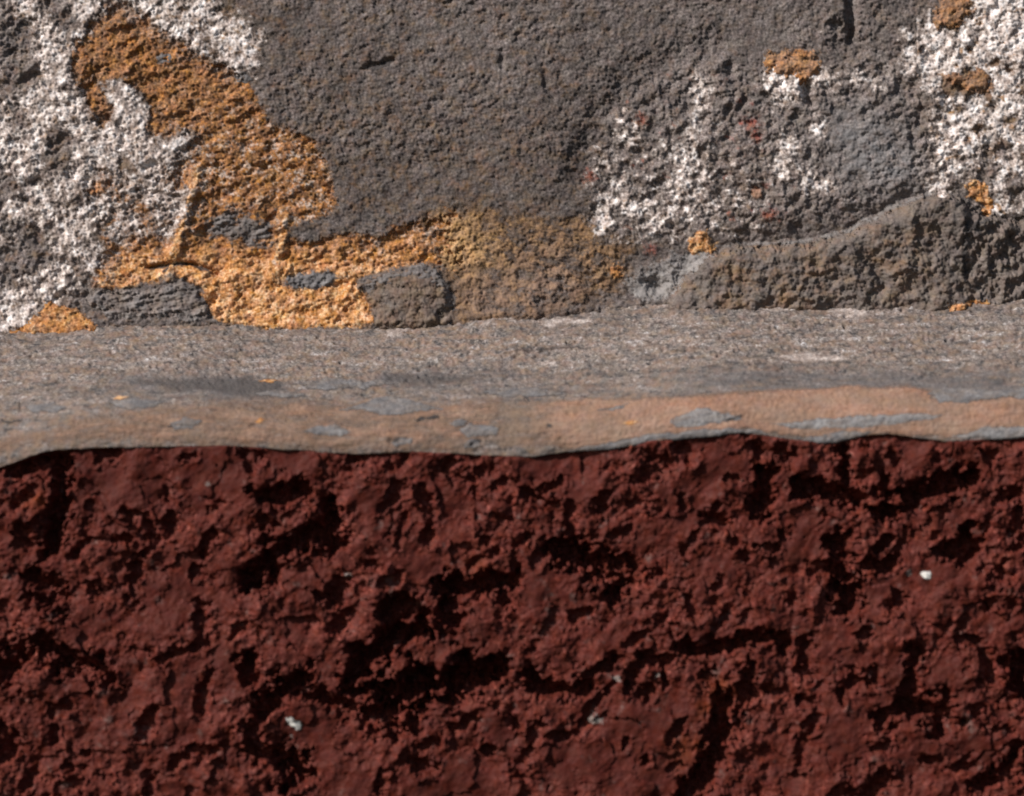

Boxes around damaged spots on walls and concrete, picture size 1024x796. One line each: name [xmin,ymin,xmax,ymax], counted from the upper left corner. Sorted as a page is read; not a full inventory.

water stain [0,0,267,334]
peeling [9,0,465,334]
water stain [439,71,840,321]
peeling [763,49,822,87]
water stain [763,58,887,140]
peeling [933,0,976,31]
water stain [896,0,1024,216]
peeling [937,67,994,96]